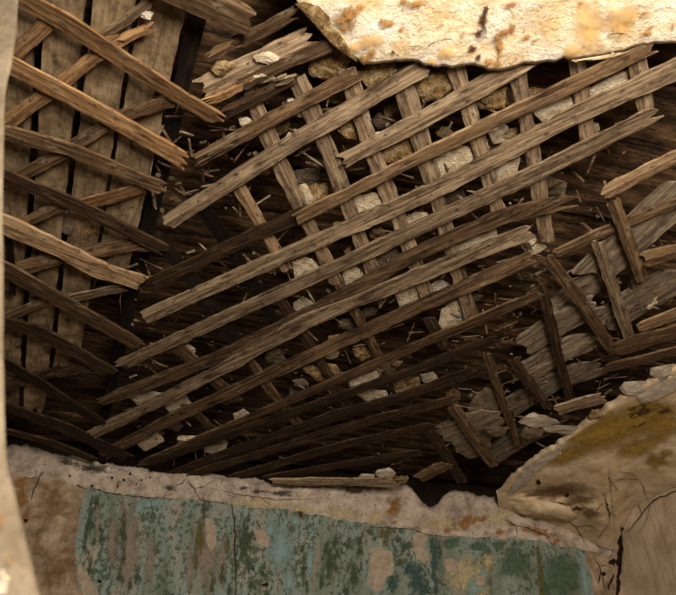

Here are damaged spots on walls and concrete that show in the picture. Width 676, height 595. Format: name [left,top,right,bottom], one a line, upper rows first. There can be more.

flaking render [568,51,629,62]
flaking render [628,375,676,427]
water stain [549,401,676,467]
water stain [525,483,597,517]
crack [77,479,311,595]
peeling [204,518,217,552]
peeling [254,530,271,548]
peeling [411,530,430,564]
crack [568,471,676,595]
peeling [74,553,99,595]
peeling [366,547,396,592]